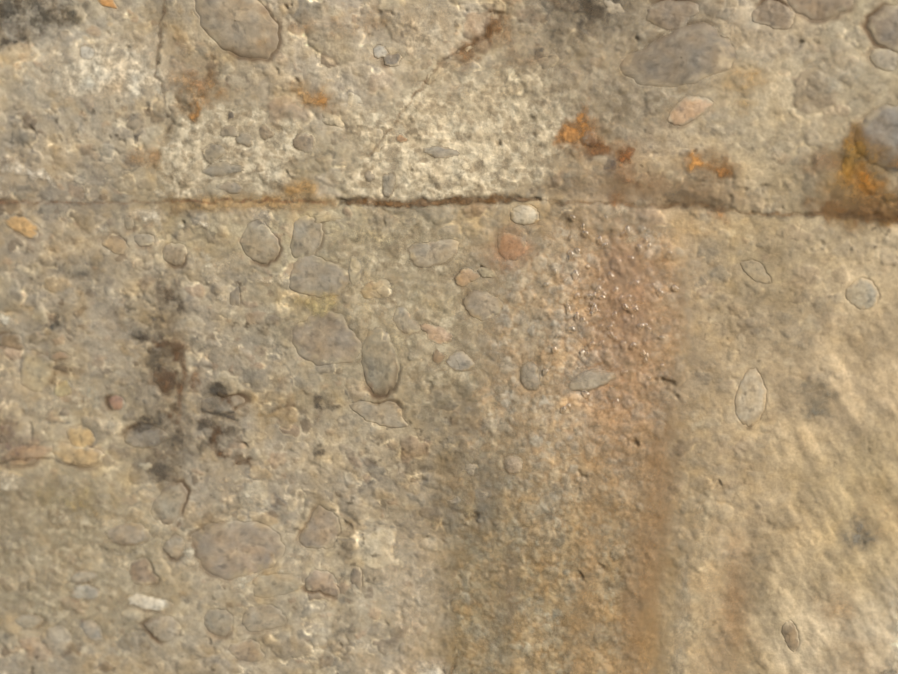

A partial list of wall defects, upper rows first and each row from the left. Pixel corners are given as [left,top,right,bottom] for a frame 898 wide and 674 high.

crack [314,194,724,212]
rust [560,113,635,183]
crack [751,212,898,221]
rust [814,130,898,226]
damp [134,281,238,481]